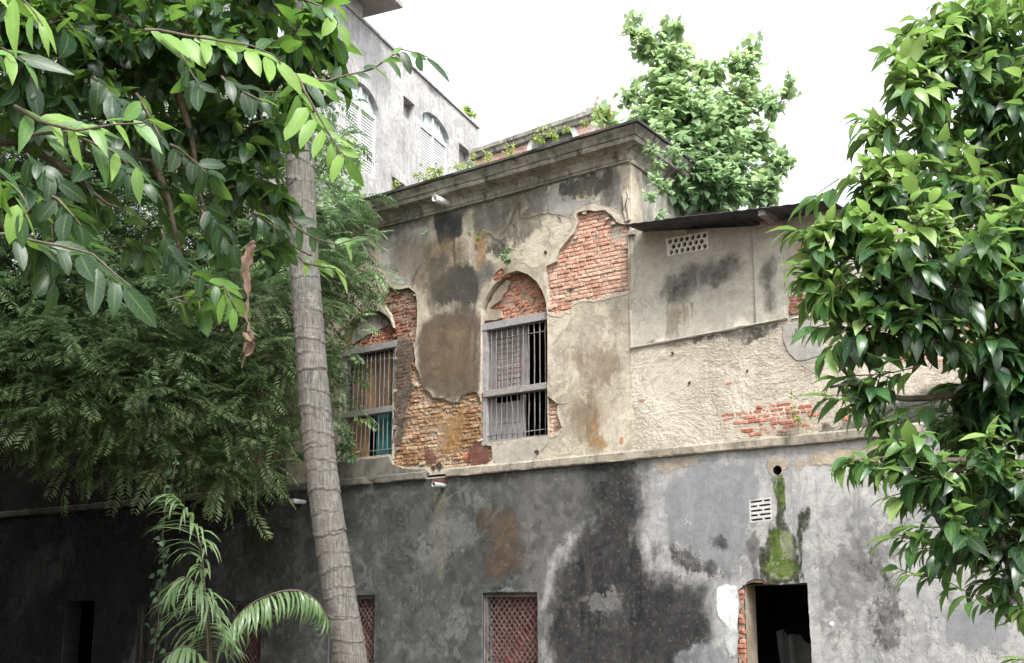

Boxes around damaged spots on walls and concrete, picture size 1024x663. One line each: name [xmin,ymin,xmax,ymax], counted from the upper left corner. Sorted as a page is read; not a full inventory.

leakage [382,206,471,291]
spalling [512,175,642,336]
leakage [661,255,738,334]
spalling [381,216,492,470]
spalling [722,402,848,437]
leakage [340,440,711,663]
spalling [738,579,768,663]